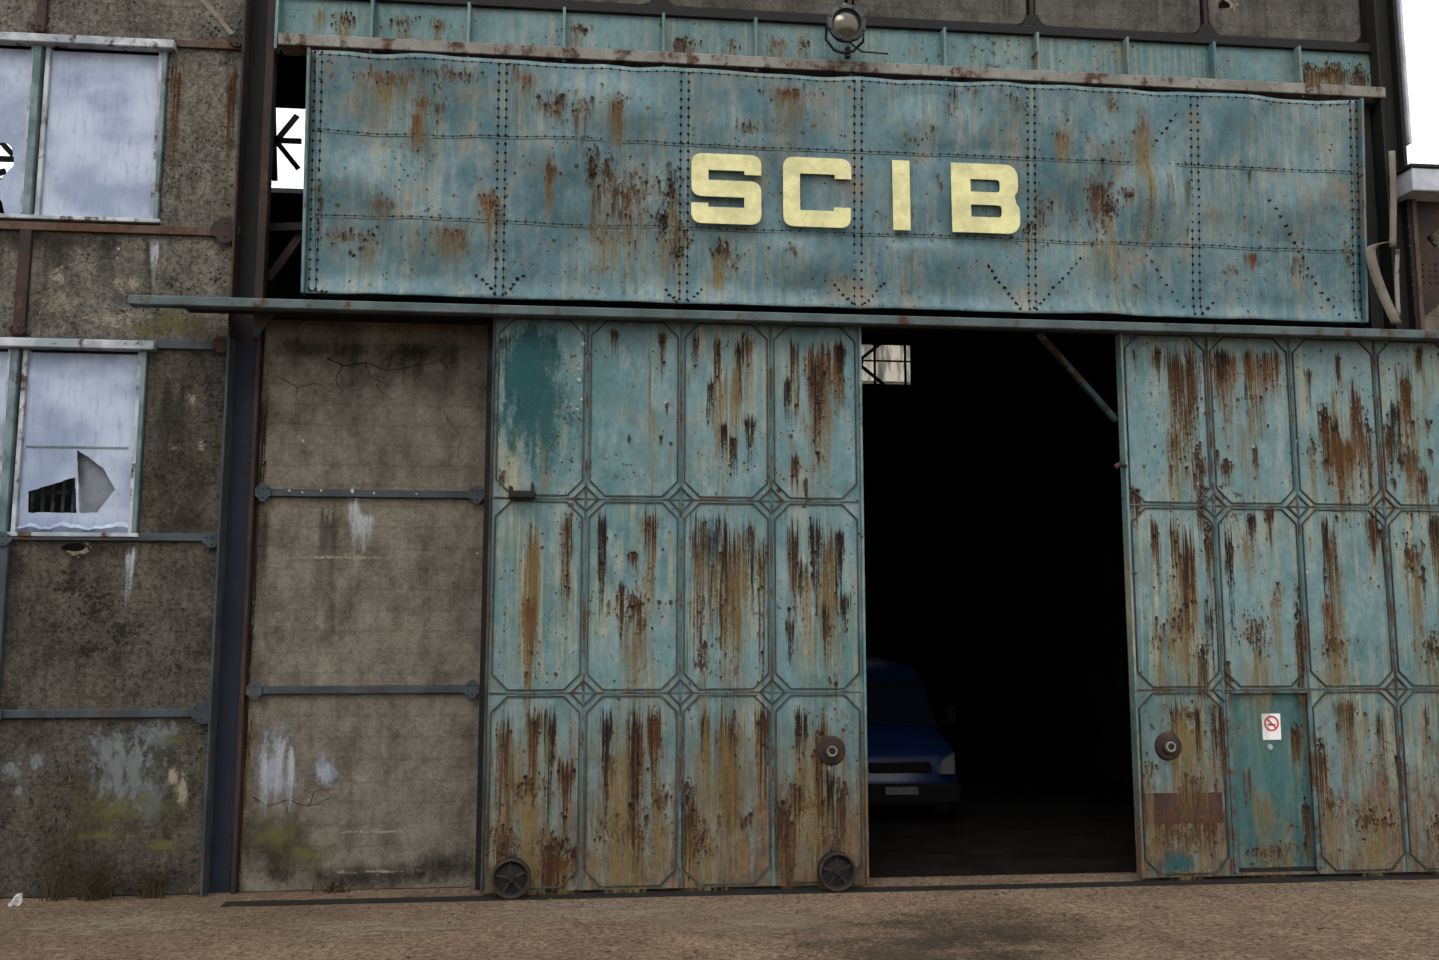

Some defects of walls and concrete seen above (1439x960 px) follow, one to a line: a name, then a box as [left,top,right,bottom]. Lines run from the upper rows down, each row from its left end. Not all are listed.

corrosion [317,10,356,36]
corrosion [389,15,451,41]
corrosion [352,63,488,153]
corrosion [1292,60,1369,86]
corrosion [311,178,394,263]
corrosion [431,188,503,265]
corrosion [512,64,697,278]
corrosion [700,237,746,285]
corrosion [1070,107,1193,261]
corrosion [489,331,852,895]
corrosion [1129,344,1439,880]
peeling [83,719,190,818]